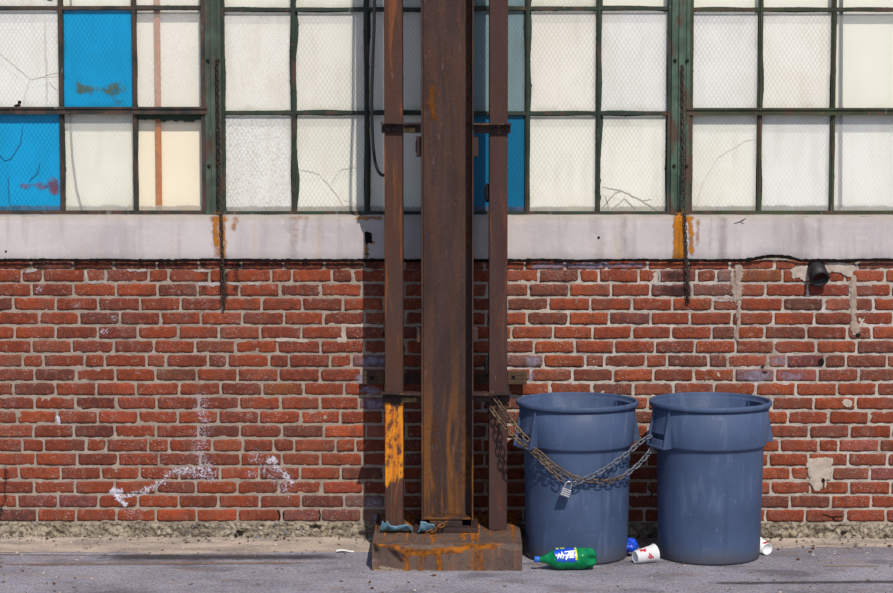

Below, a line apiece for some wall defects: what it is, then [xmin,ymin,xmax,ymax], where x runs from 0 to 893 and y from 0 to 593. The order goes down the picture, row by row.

rust [212,216,235,257]
rust [673,213,699,260]
peeling [841,263,872,286]
rust [375,512,518,571]